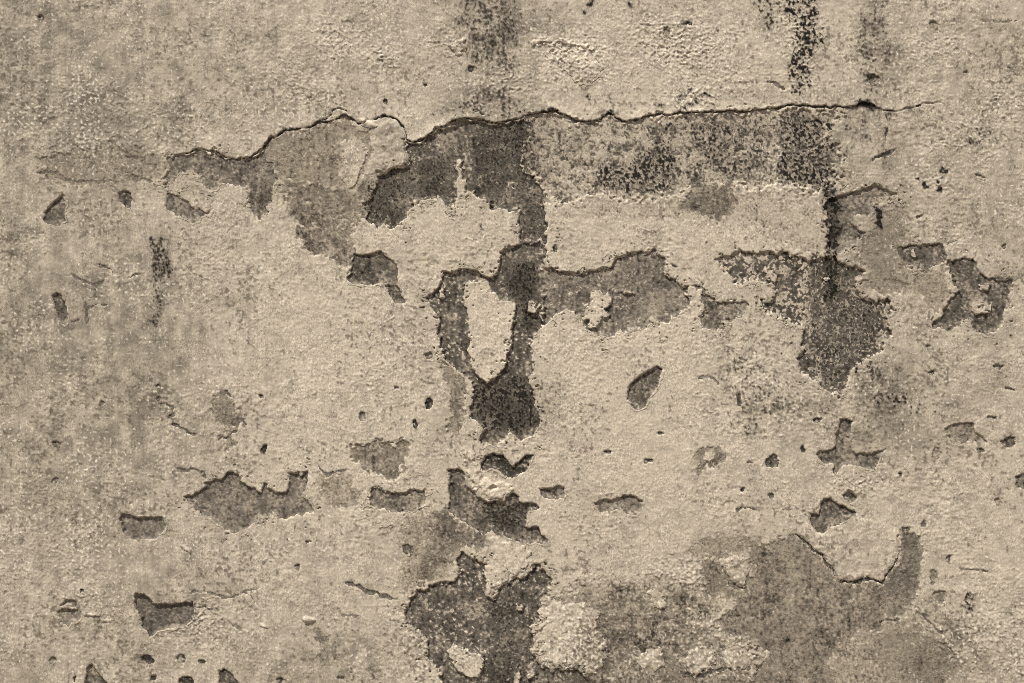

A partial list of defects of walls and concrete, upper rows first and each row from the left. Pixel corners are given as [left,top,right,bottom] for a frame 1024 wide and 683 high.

crack [186,81,859,160]
crack [872,104,921,161]
peeling [341,108,906,478]
peeling [892,227,1017,351]
peeling [117,512,168,540]
peeling [168,457,315,542]
peeling [360,482,433,516]
peeling [445,469,567,547]
crack [795,534,898,585]
peeling [795,489,927,581]
peeling [132,592,195,639]
peeling [399,551,588,683]